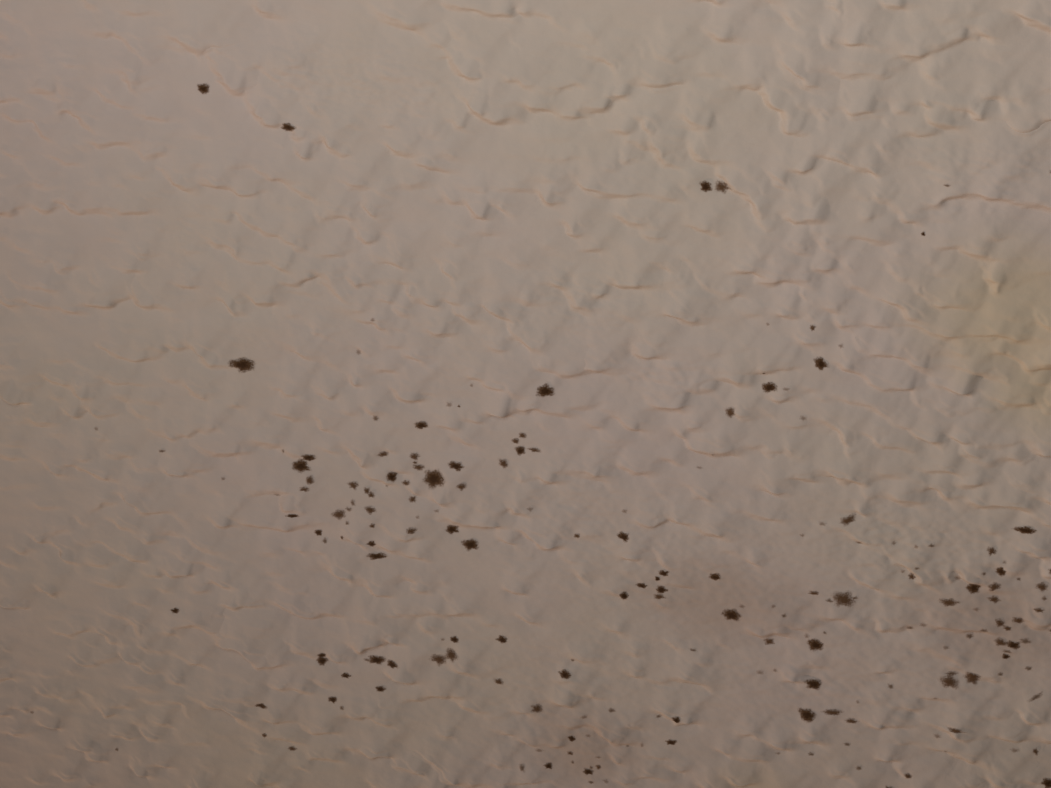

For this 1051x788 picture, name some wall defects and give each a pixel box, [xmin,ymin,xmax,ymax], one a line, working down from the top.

water stain [513,433,540,455]
water stain [293,455,315,492]
water stain [334,482,375,527]
water stain [387,473,415,502]
water stain [411,454,462,488]
water stain [446,525,477,549]
water stain [592,540,1051,700]
water stain [499,660,680,788]
water stain [799,708,857,723]